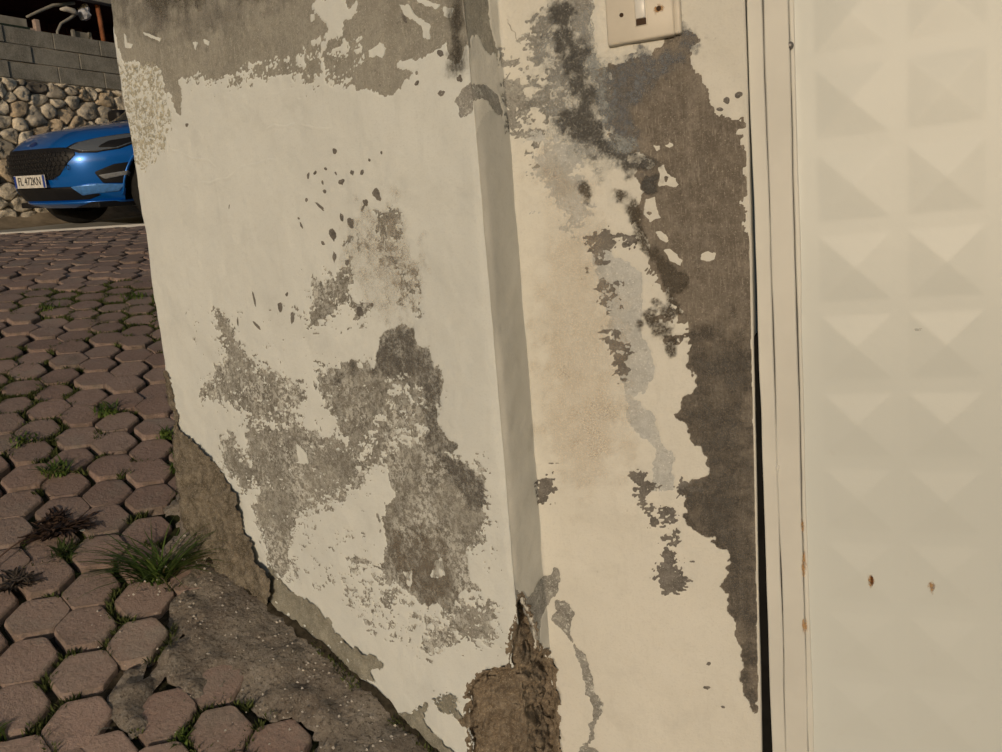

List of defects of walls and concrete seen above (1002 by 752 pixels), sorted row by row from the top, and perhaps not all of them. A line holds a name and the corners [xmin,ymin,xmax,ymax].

peeling [111,0,759,752]
leakage [448,0,464,72]